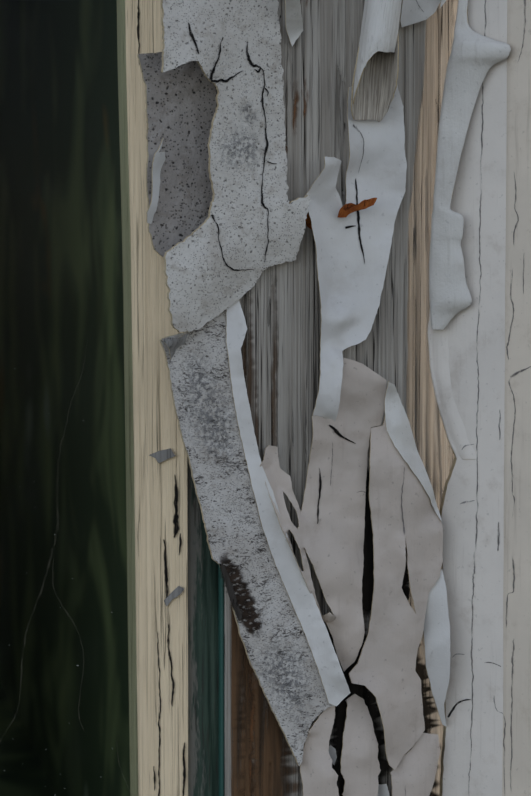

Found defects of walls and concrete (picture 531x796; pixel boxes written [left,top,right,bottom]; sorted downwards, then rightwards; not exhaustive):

crack [188,23,199,54]
crack [210,37,277,271]
crack [478,83,486,147]
crack [345,179,365,263]
crack [476,201,484,297]
peeling [137,0,451,796]
crack [499,260,531,503]
crack [317,425,356,524]
crack [399,483,407,532]
crack [460,428,478,544]
crack [447,562,515,789]